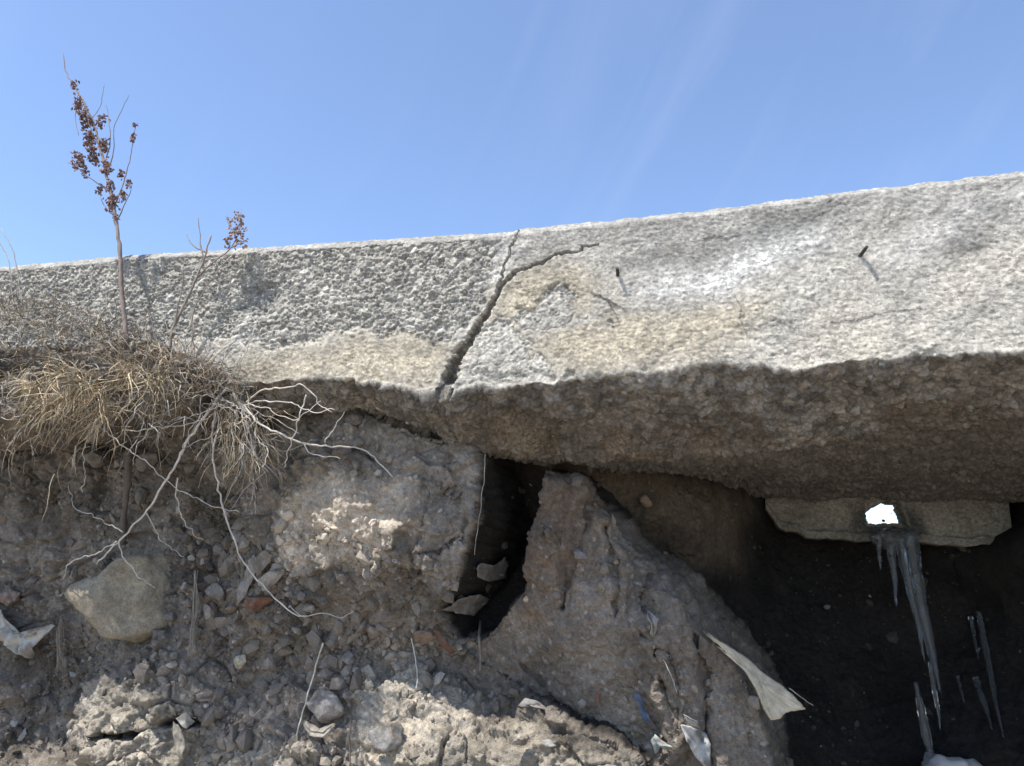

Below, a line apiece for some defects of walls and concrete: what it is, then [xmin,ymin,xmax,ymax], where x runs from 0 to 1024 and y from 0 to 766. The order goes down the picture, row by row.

crack [442,230,599,384]
crack [568,281,627,325]